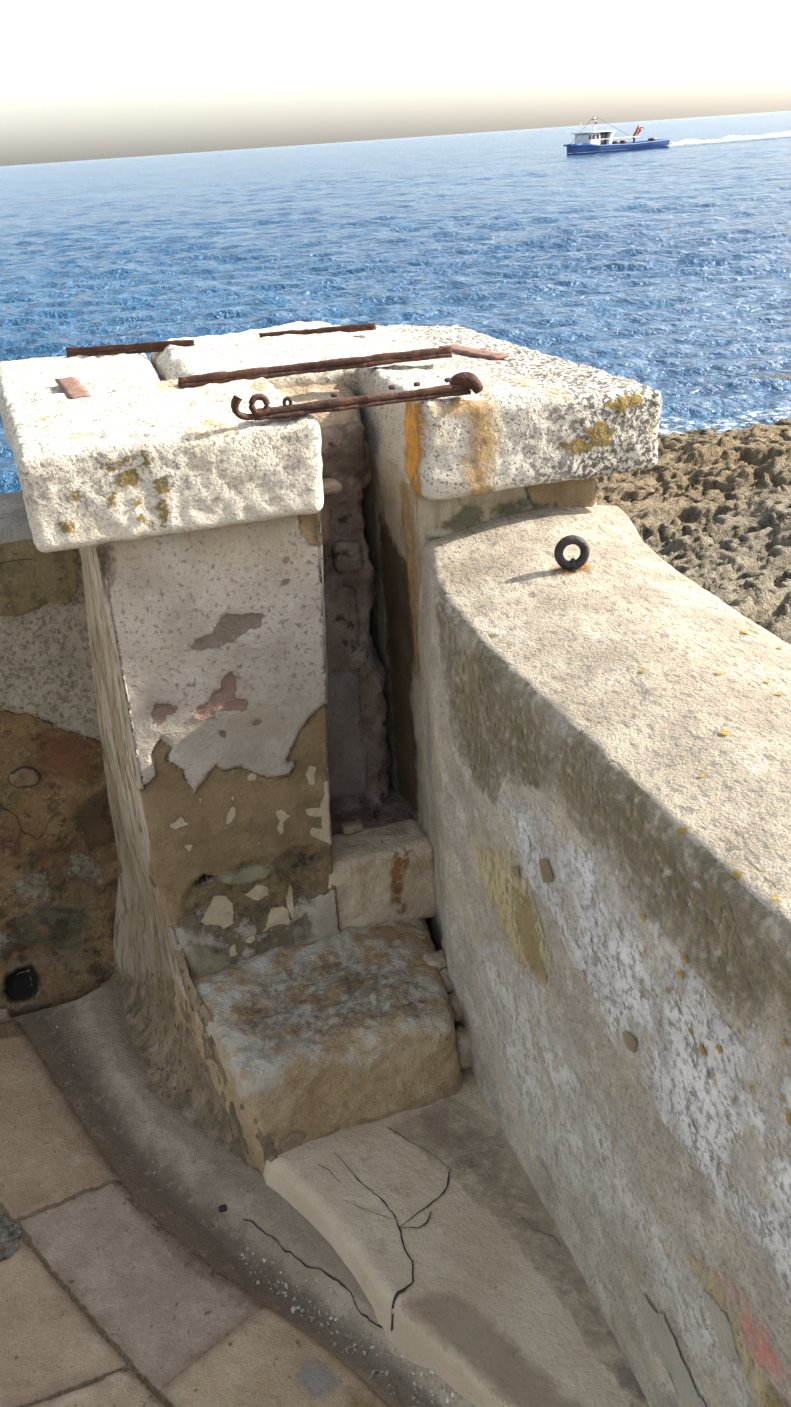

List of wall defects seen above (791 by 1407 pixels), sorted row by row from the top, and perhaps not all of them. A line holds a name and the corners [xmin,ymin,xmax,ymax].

rust [441,395,499,496]
flaking render [190,613,264,651]
flaking render [193,672,262,738]
flaking render [0,710,119,1017]
flaking render [128,703,336,957]
crack [242,1127,450,1331]